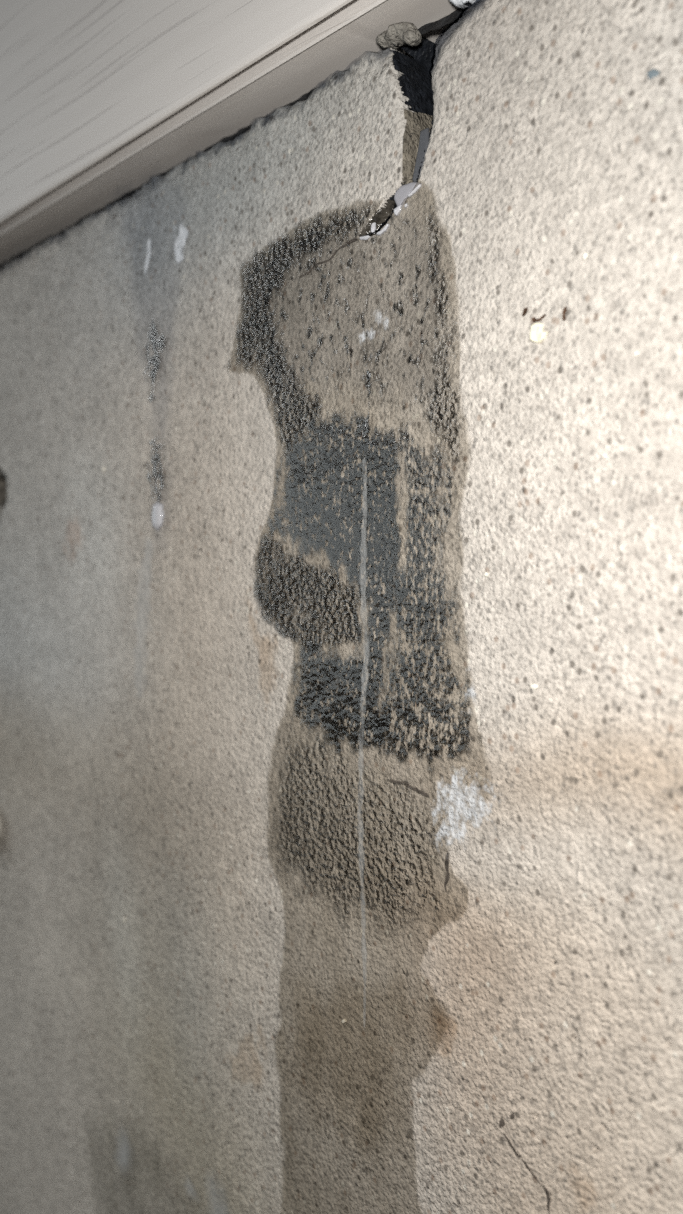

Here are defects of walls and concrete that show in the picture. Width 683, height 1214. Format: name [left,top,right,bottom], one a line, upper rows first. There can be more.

crack [299,13,463,278]
efflorescence [435,776,484,838]